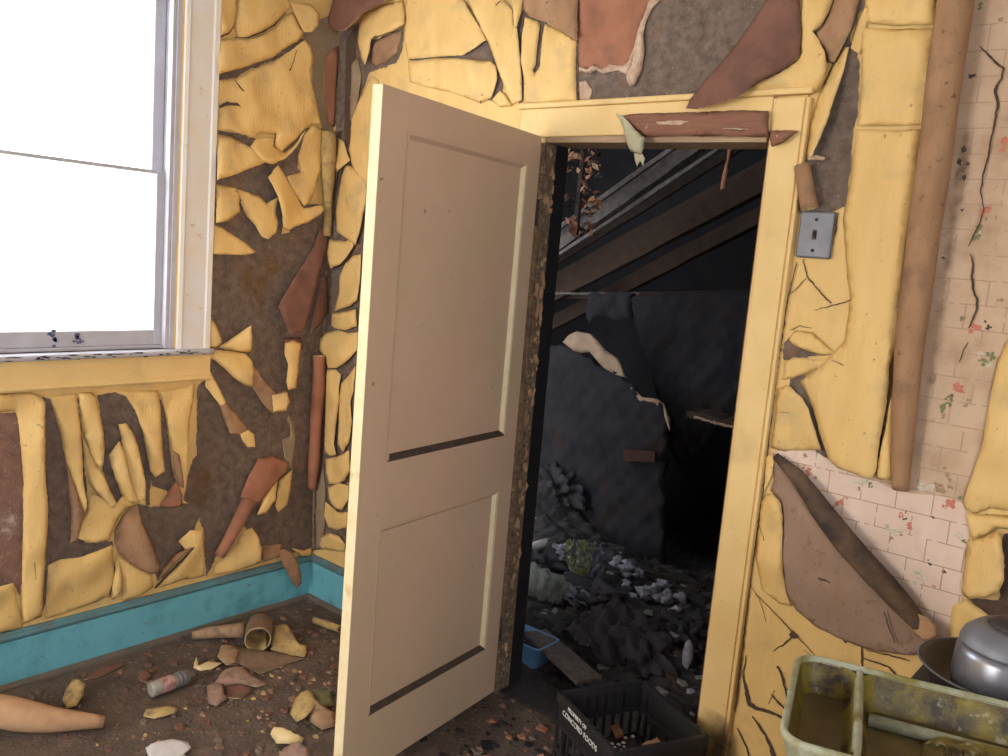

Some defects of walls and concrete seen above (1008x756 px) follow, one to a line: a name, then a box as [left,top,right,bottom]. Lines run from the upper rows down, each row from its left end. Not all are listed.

peeling [0,0,936,633]
crack [959,46,1005,362]
crack [734,262,814,756]
crack [840,641,909,674]
peeling [949,341,1008,637]